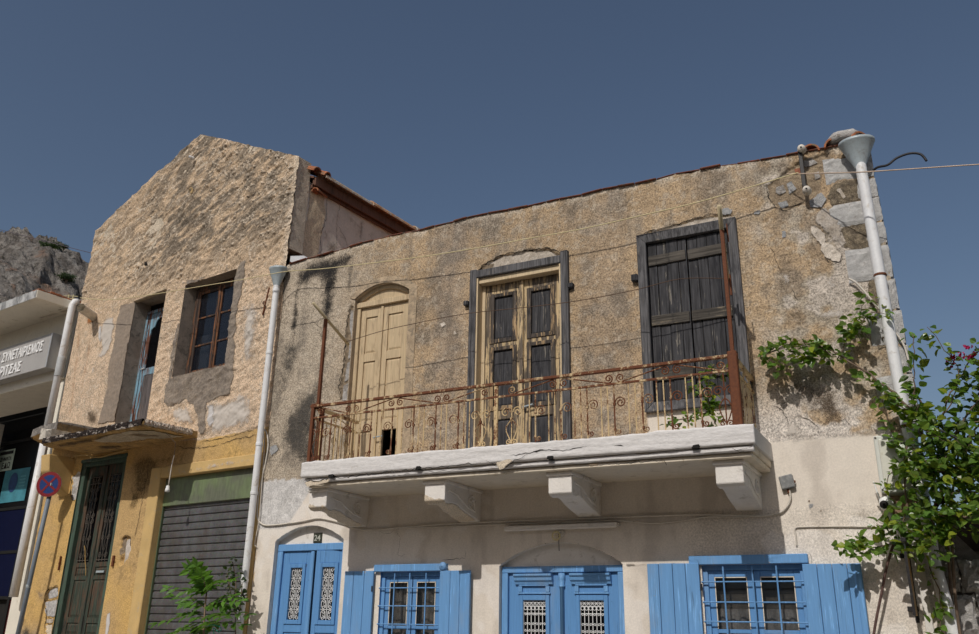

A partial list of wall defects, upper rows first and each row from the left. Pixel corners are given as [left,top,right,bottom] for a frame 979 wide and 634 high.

spalling [766,154,861,211]
spalling [811,224,868,265]
peeling [98,317,114,357]
leakage [281,244,353,389]
spalling [868,280,878,308]
peeling [207,394,250,434]
leakage [285,387,317,462]
spalling [44,585,58,634]